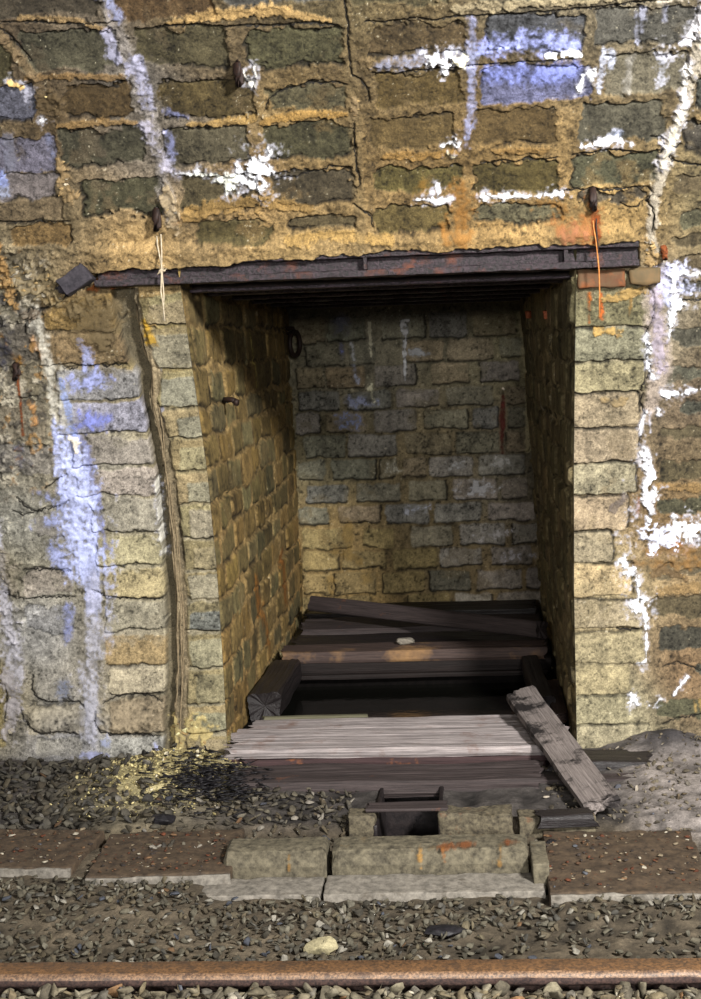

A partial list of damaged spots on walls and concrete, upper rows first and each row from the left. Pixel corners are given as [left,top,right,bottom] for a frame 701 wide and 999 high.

leakage [635,5,646,45]
leakage [683,8,701,46]
leakage [100,0,275,196]
leakage [424,29,633,159]
leakage [659,63,693,170]
leakage [416,183,453,205]
leakage [480,190,565,202]
leakage [643,261,701,379]
leakage [661,388,701,399]
leakage [30,306,115,759]
leakage [636,447,701,556]
leakage [617,555,649,664]